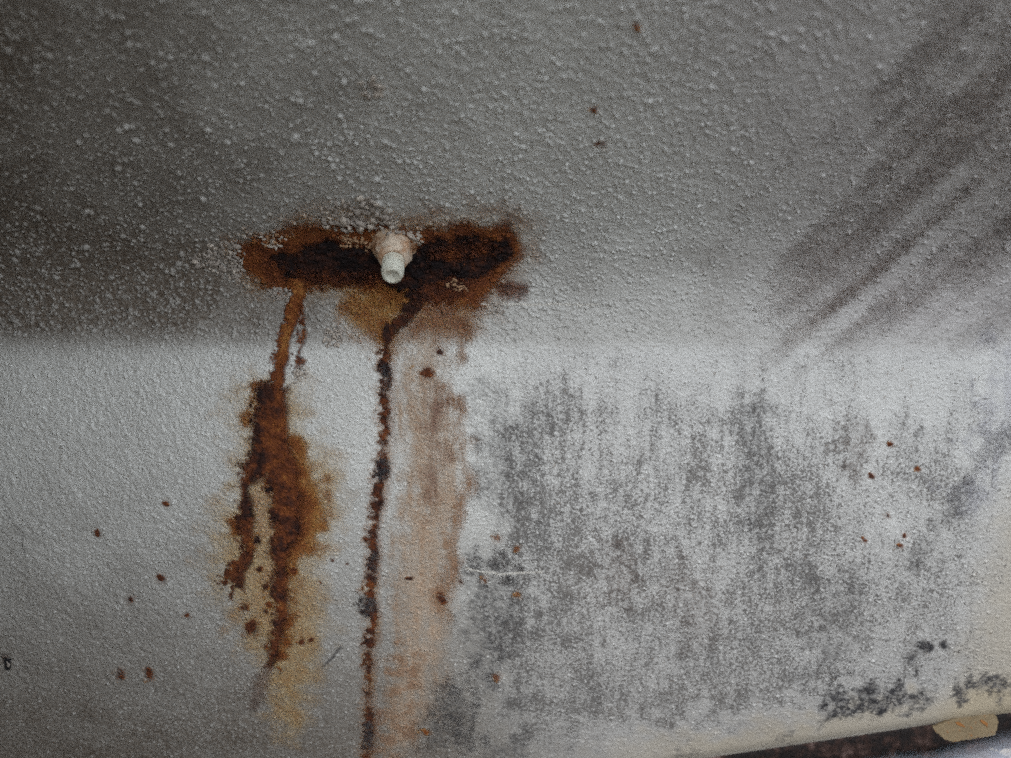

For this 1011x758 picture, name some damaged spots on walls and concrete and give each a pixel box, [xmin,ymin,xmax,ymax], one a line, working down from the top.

rust [215,222,527,758]
damp [907,640,947,674]
damp [821,679,930,720]
damp [953,675,1009,705]